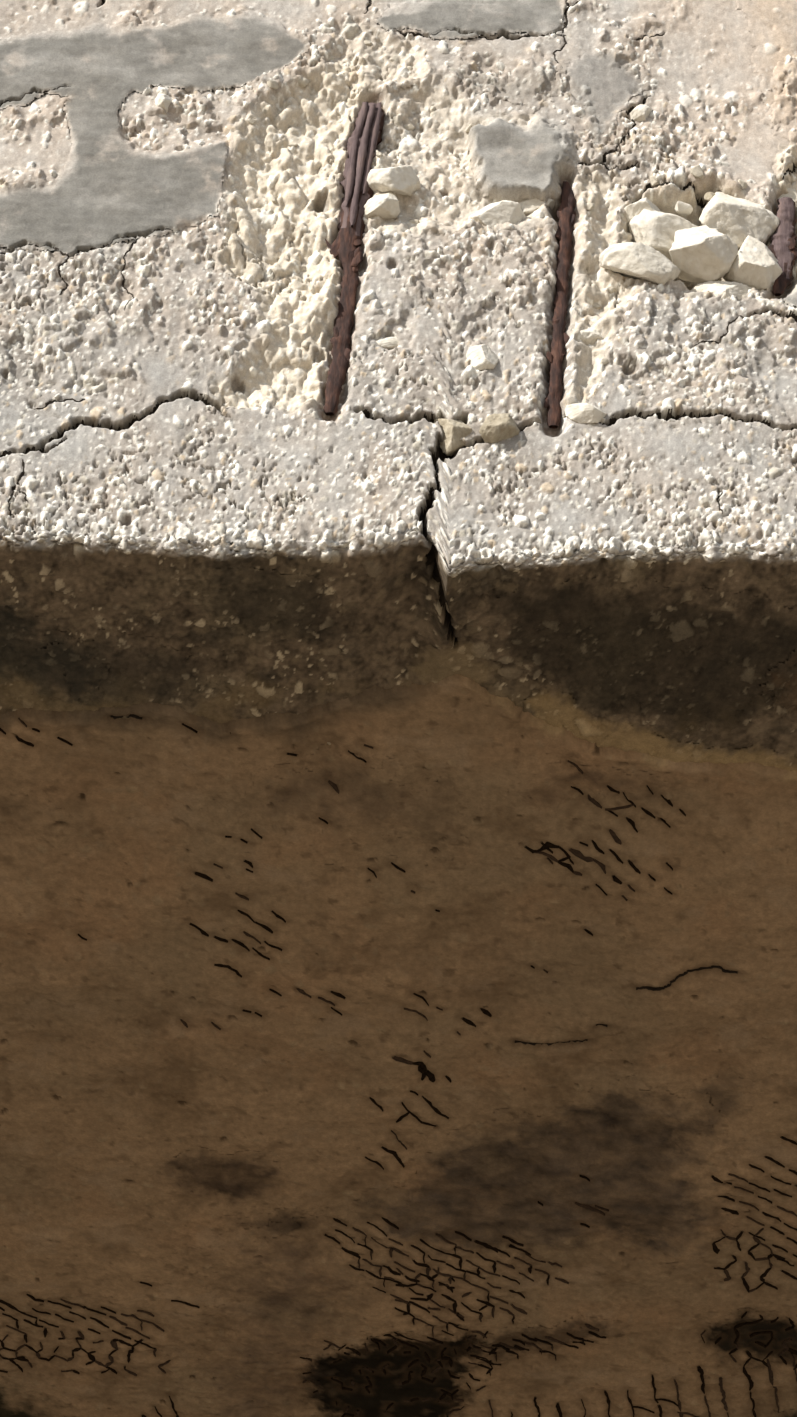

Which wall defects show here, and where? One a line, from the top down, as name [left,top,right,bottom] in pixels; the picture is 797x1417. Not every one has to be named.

crack [364,0,580,80]
corrosion [323,102,385,416]
spalling [209,24,797,420]
corrosion [544,181,576,429]
crack [694,310,797,346]
corrosion [768,197,797,296]
crack [0,393,210,517]
crack [600,409,794,431]
crack [363,409,485,645]
damp [155,1062,759,1417]
damp [0,1376,79,1417]
damp [697,1308,797,1370]